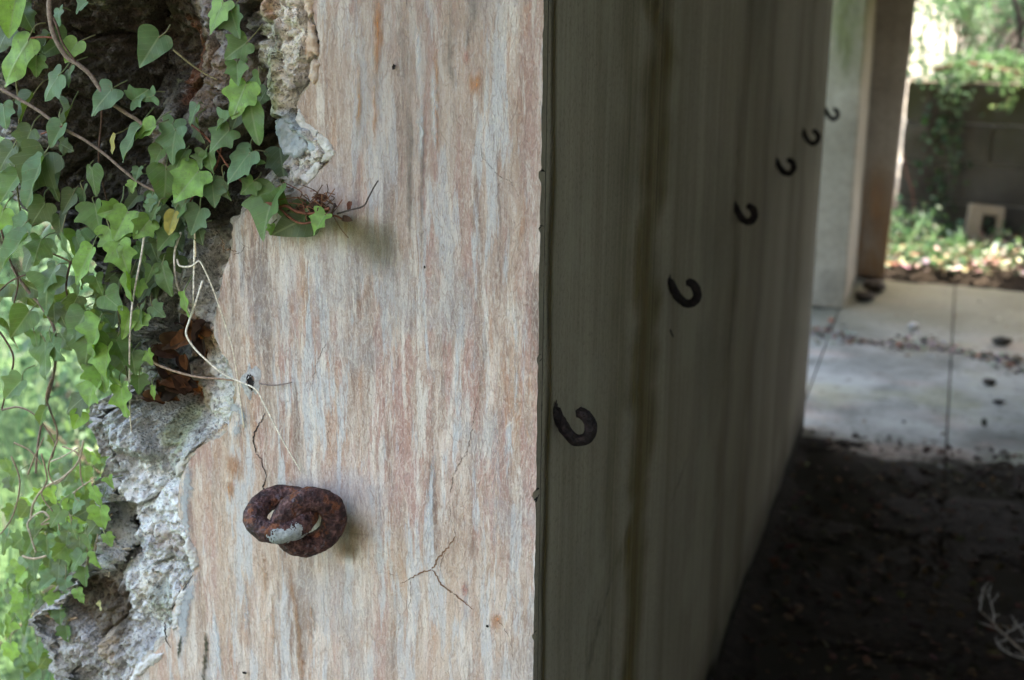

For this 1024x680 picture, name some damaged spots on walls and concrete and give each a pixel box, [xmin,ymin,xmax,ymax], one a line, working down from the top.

spalling [304,0,320,84]
spalling [275,109,335,184]
spalling [240,362,261,400]
crack [253,413,267,489]
crack [391,398,477,616]
spalling [183,537,199,570]
spalling [172,590,186,630]
spalling [130,652,164,680]